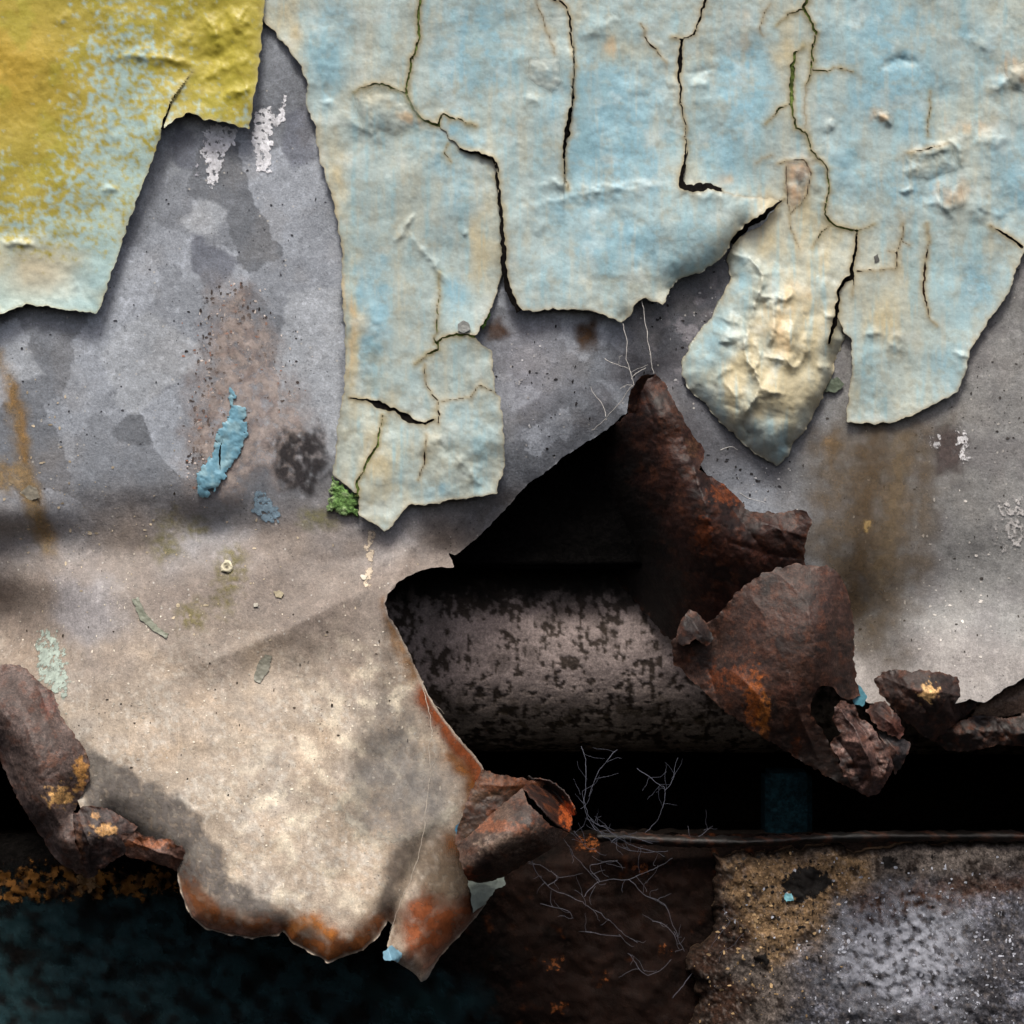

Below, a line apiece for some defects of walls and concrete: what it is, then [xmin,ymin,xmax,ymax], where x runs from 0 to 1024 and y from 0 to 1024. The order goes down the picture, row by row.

crack [444,148,522,313]
peeling [0,0,1024,531]
crack [538,0,575,182]
crack [645,0,722,192]
crack [730,0,903,344]
crack [350,289,496,497]
corrosion [627,374,654,413]
leakage [807,429,941,637]
corrosion [0,664,386,960]
corrosion [671,563,860,789]
corrosion [934,713,1024,752]
corrosion [403,895,480,970]